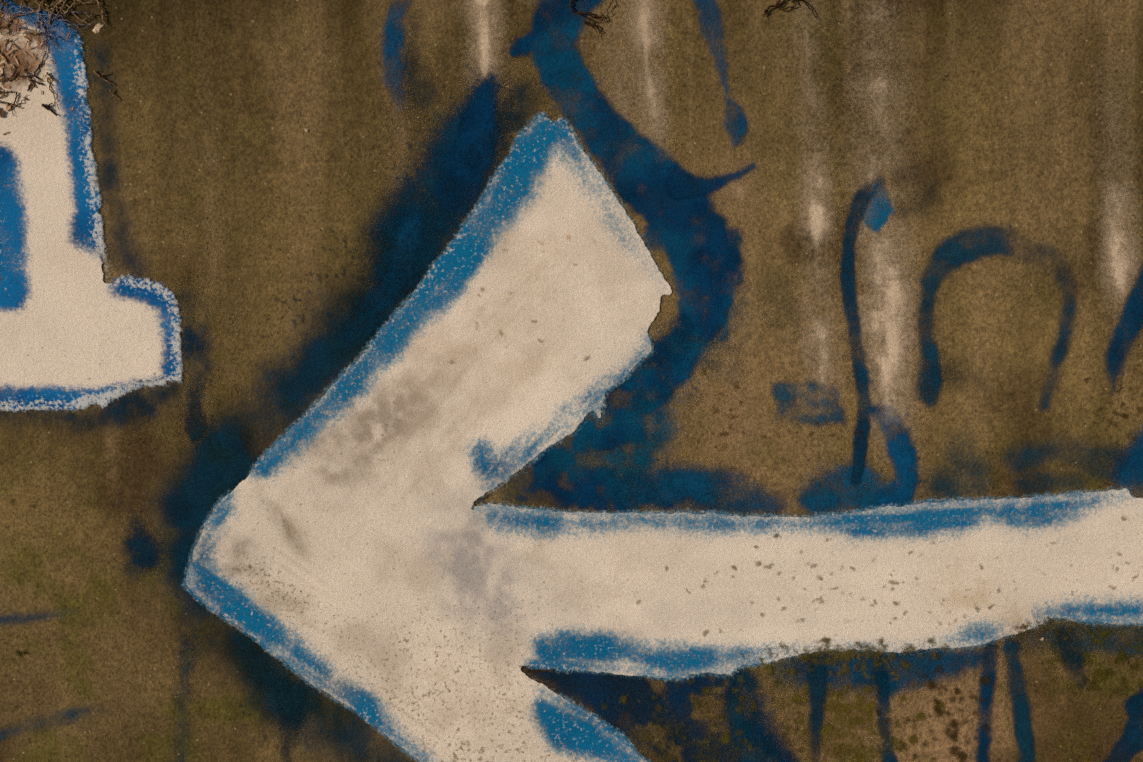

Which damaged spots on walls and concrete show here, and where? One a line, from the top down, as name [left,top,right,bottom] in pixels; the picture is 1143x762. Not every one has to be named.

leakage [467,0,498,79]
leakage [631,0,661,128]
leakage [804,159,831,245]
leakage [1104,189,1136,297]
leakage [805,322,828,384]
leakage [861,208,914,425]